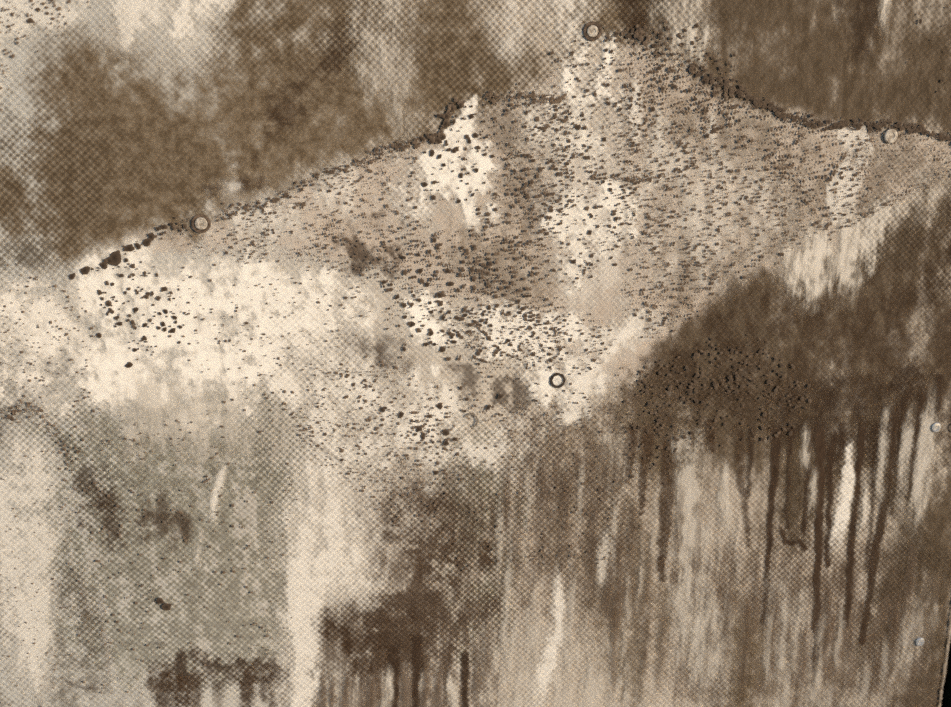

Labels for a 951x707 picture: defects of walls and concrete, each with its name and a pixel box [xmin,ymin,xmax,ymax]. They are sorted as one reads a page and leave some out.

damp [0,426,90,686]